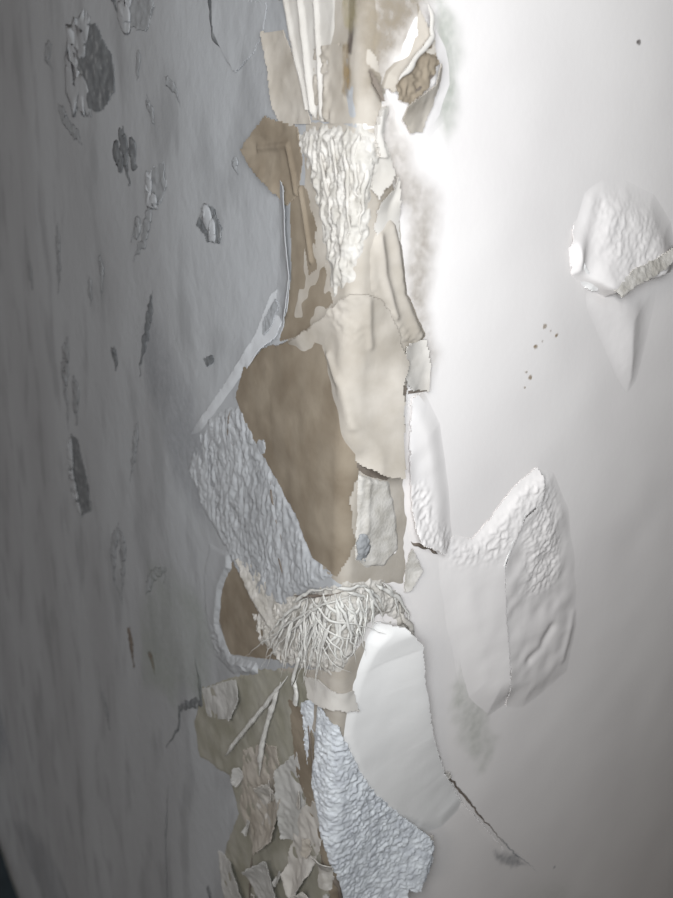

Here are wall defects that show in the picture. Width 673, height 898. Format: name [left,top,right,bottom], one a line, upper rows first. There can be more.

peeling [64,9,115,117]
peeling [144,162,167,209]
peeling [188,0,452,605]
peeling [194,613,461,898]
crack [444,771,536,871]